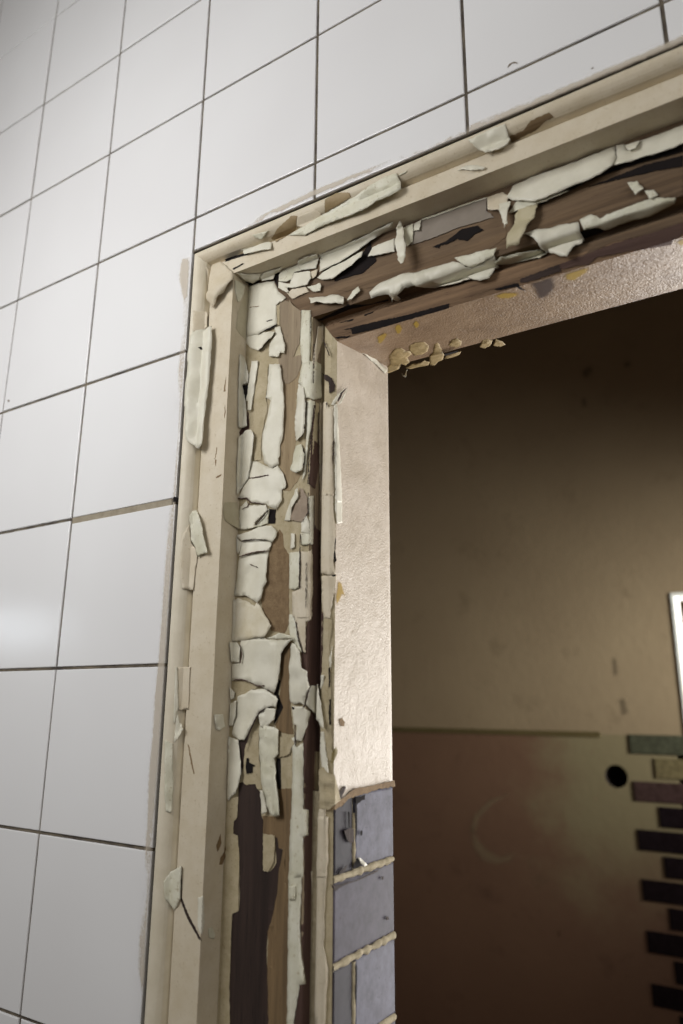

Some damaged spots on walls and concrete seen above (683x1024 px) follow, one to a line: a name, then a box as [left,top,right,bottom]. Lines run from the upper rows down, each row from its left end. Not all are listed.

peeling [469,113,554,153]
peeling [180,125,683,1024]
peeling [164,666,191,813]
peeling [163,866,182,911]